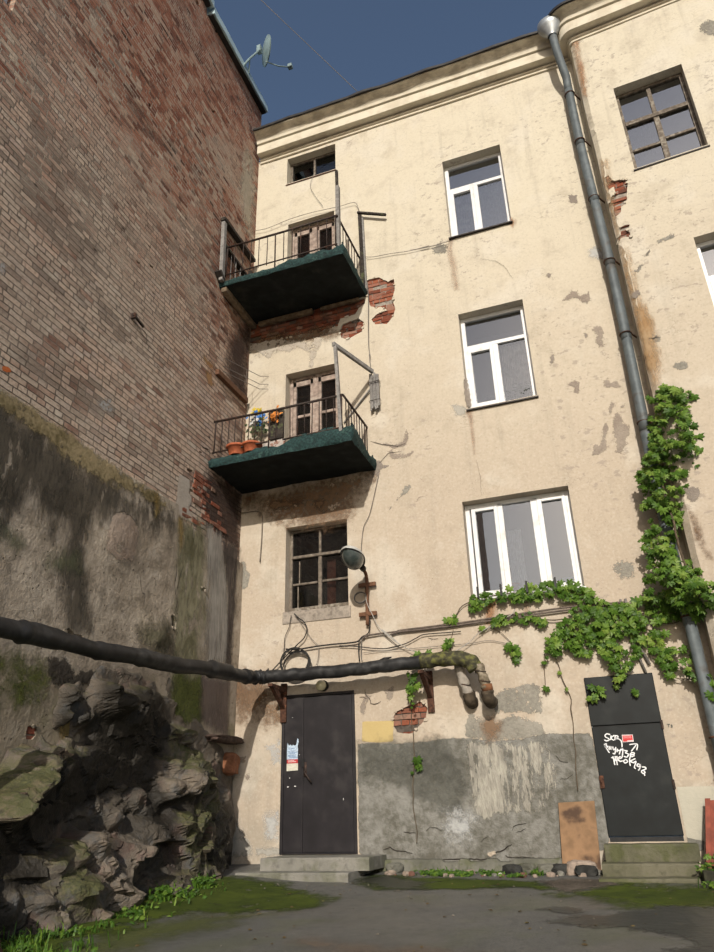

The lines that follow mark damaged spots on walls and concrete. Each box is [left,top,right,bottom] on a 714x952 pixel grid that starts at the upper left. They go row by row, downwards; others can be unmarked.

flaking render [606,176,633,246]
flaking render [250,276,395,368]
peeling [562,290,591,303]
corrosion [623,253,658,381]
peeling [592,402,630,456]
damp [0,405,174,634]
spalling [182,470,227,534]
flaking render [384,687,428,734]